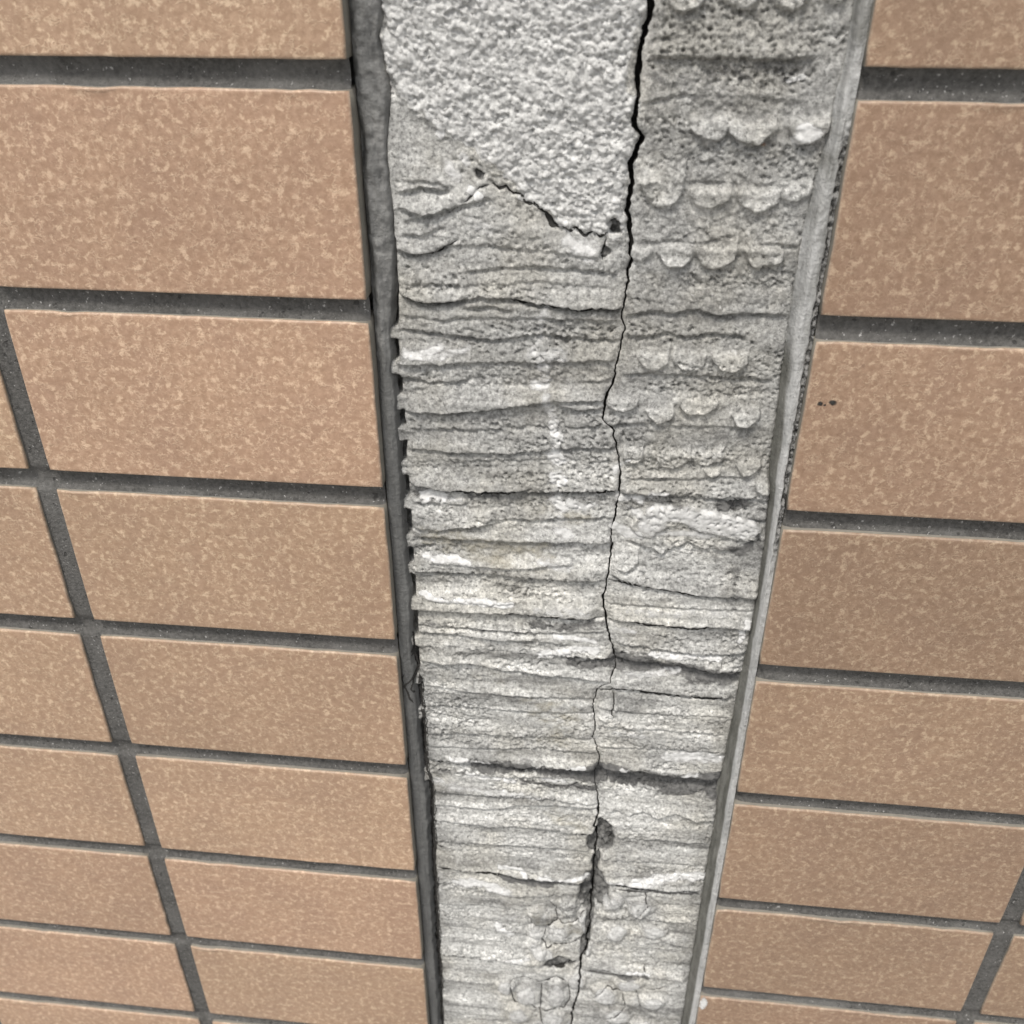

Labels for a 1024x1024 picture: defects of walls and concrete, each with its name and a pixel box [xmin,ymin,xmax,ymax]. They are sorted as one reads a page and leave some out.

crack [446,489,515,497]
crack [464,0,724,1024]
peeling [608,499,759,540]
spalling [545,817,615,965]